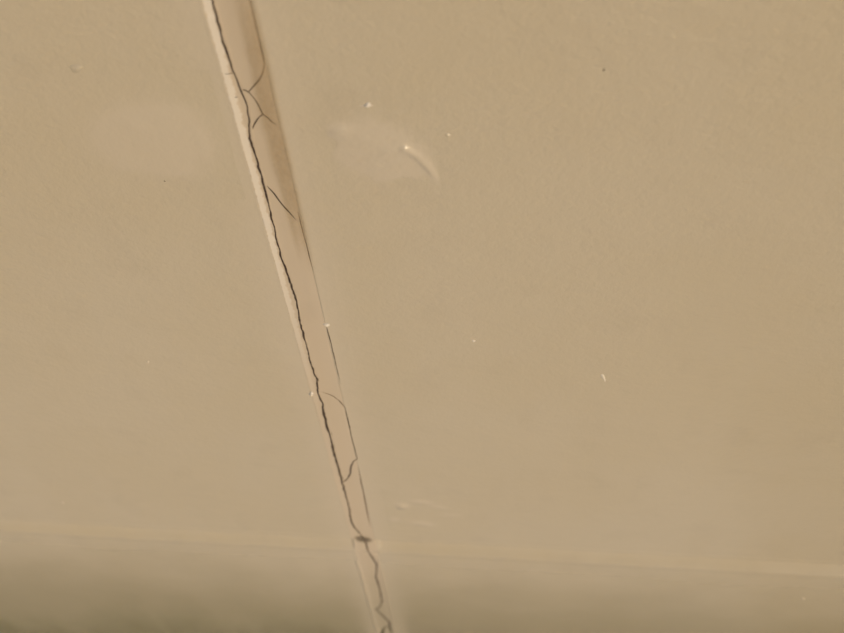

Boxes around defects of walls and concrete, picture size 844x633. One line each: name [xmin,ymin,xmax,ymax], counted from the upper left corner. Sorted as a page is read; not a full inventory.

crack [211,0,392,633]